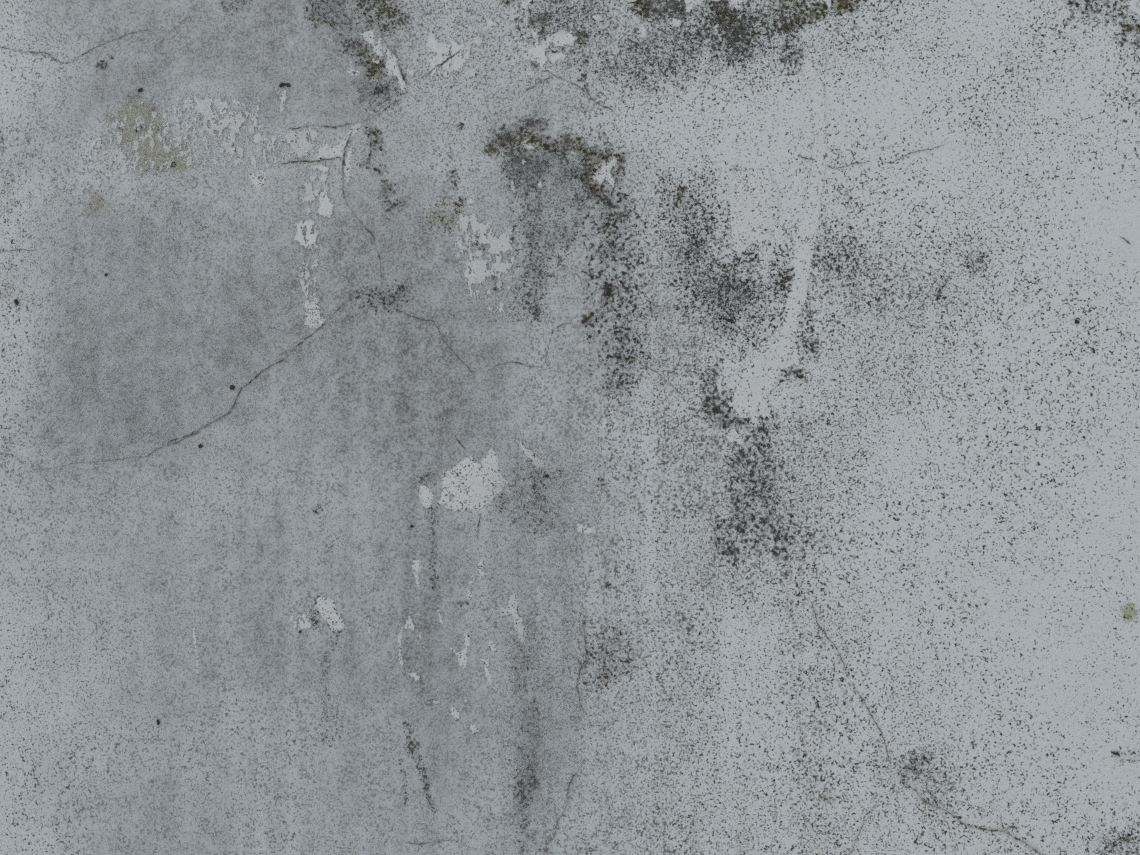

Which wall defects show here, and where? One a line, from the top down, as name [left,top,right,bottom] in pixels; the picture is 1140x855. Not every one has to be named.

peeling [276,83,291,112]
damp [515,0,806,92]
peeling [90,88,361,329]
peeling [455,193,515,321]
damp [480,113,950,399]
crack [47,304,344,469]
peeling [418,448,508,512]
damp [699,365,796,566]
peeling [285,596,345,633]
damp [511,627,550,855]
damp [578,622,643,694]
crack [805,590,1041,854]